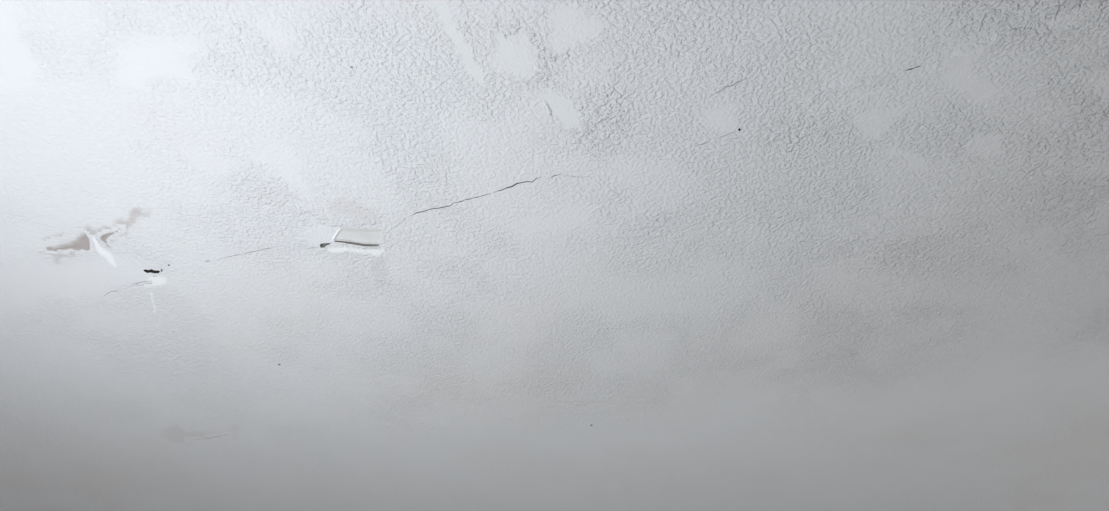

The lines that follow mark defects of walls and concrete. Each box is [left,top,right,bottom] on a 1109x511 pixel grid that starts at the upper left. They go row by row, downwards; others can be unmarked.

flaking render [37,205,157,265]
flaking render [320,228,386,257]
crack [384,174,575,237]